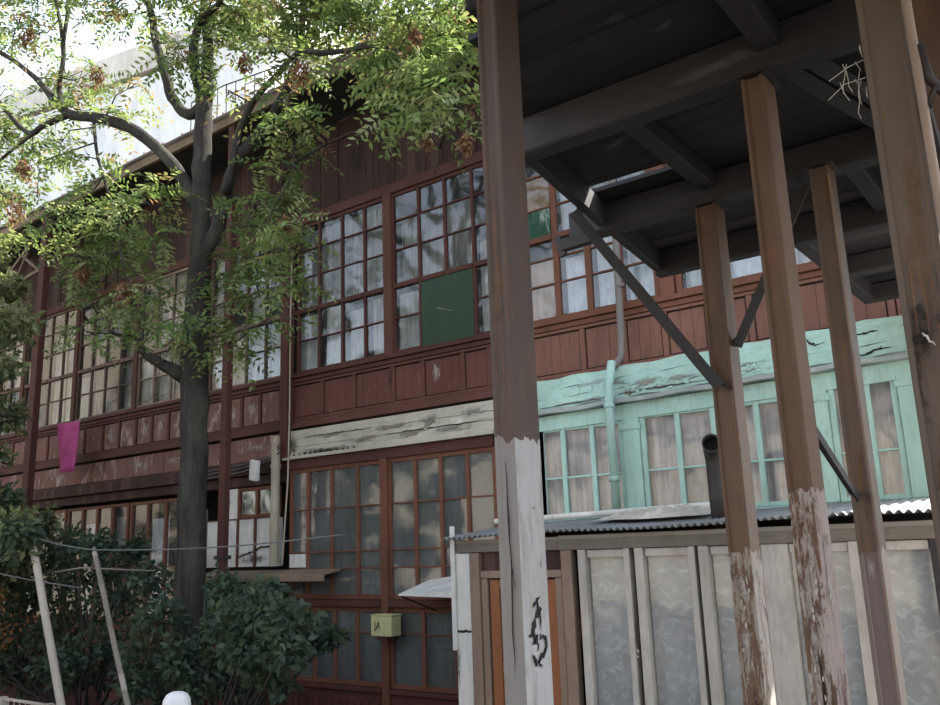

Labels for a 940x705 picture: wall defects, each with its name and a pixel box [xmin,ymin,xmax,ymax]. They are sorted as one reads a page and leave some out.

crack [857,330,890,356]
peeling [557,373,702,407]
peeling [317,408,485,444]
peeling [740,569,762,610]
peeling [805,533,848,705]
peeling [742,622,753,666]